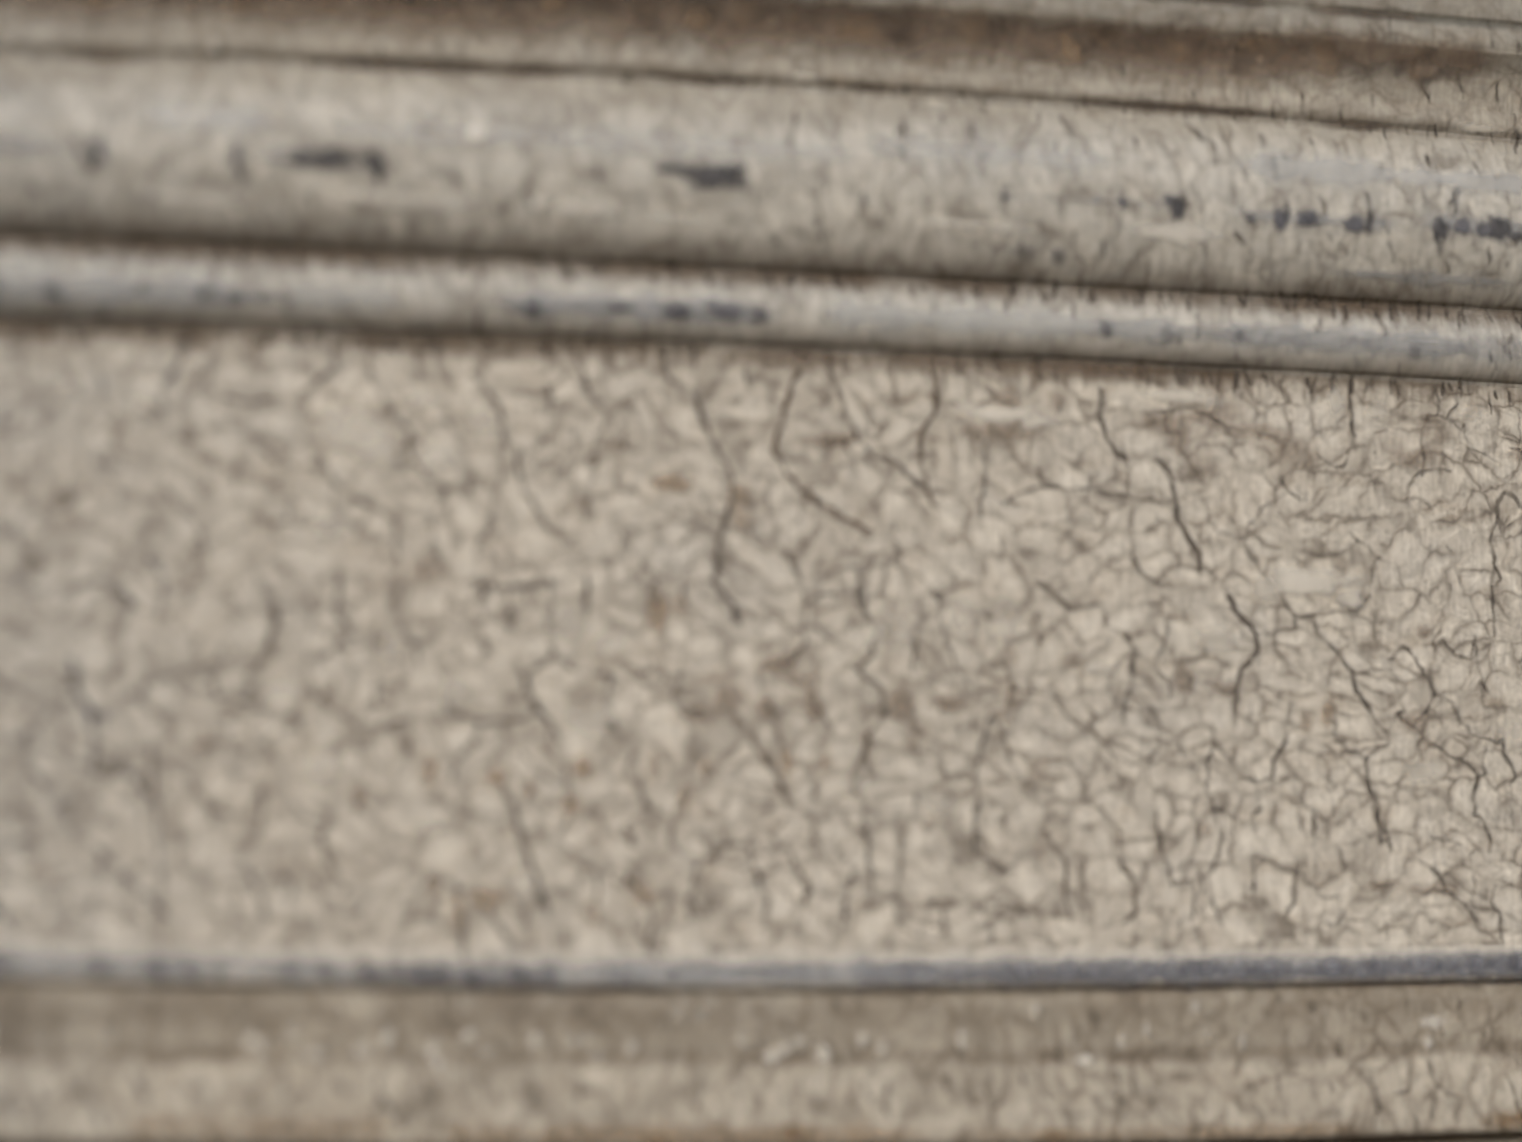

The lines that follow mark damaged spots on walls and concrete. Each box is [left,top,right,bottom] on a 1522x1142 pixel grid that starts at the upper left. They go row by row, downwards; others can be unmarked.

crack [14,85,1522,960]